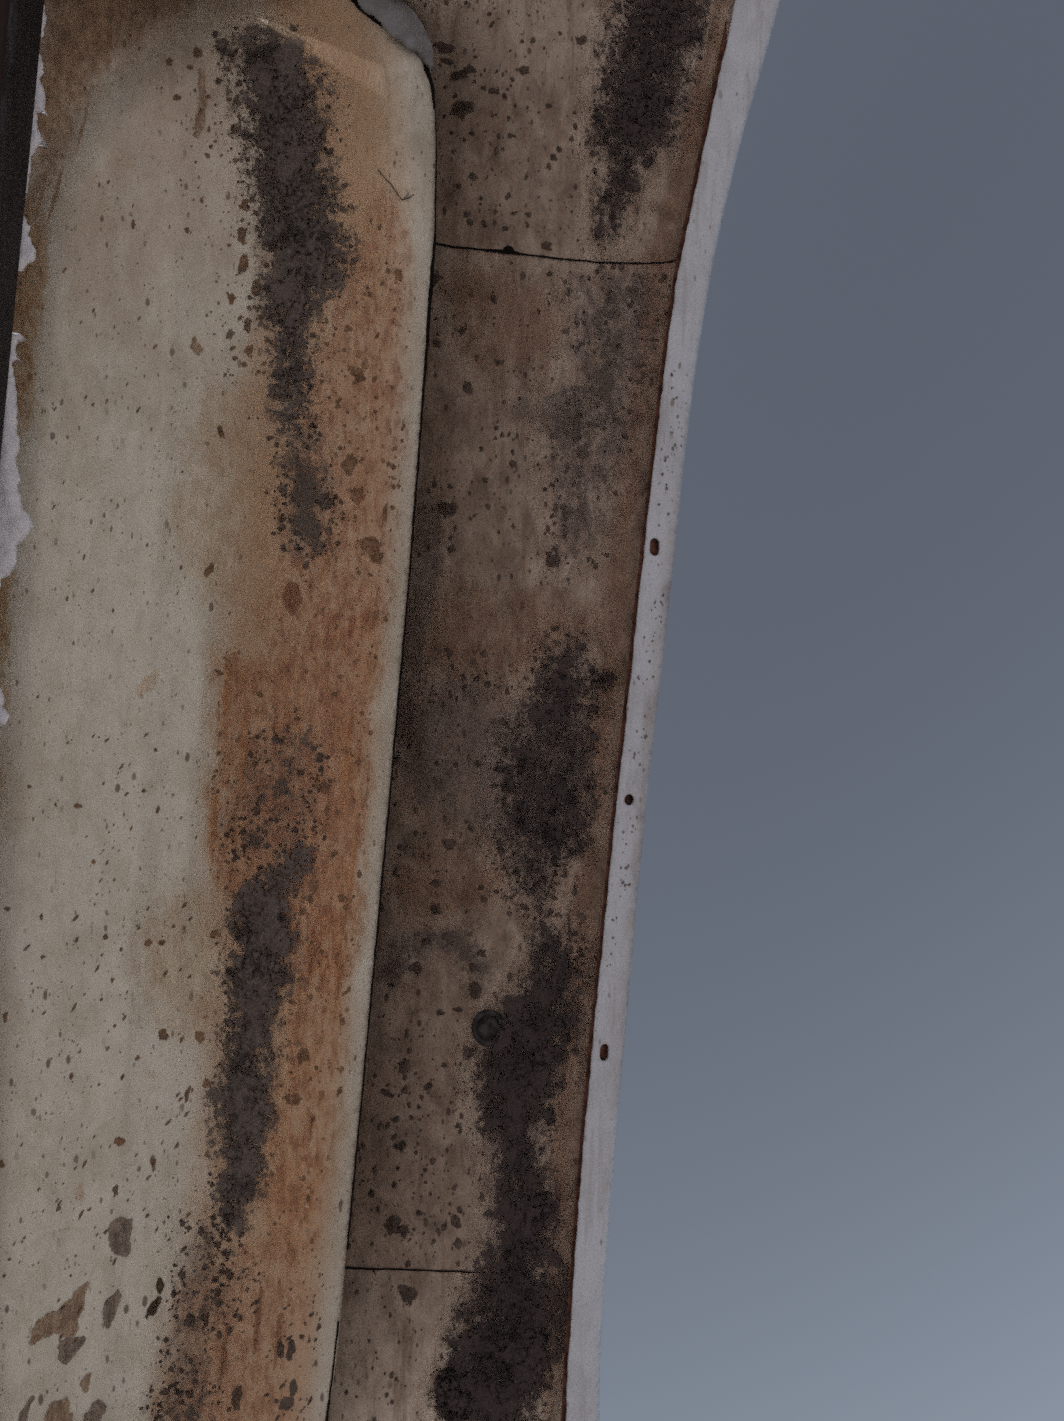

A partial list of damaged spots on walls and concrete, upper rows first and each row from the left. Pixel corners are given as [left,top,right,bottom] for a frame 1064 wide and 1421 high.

crack [345,62,676,1276]
leakage [421,931,486,1016]
crack [326,1321,339,1421]